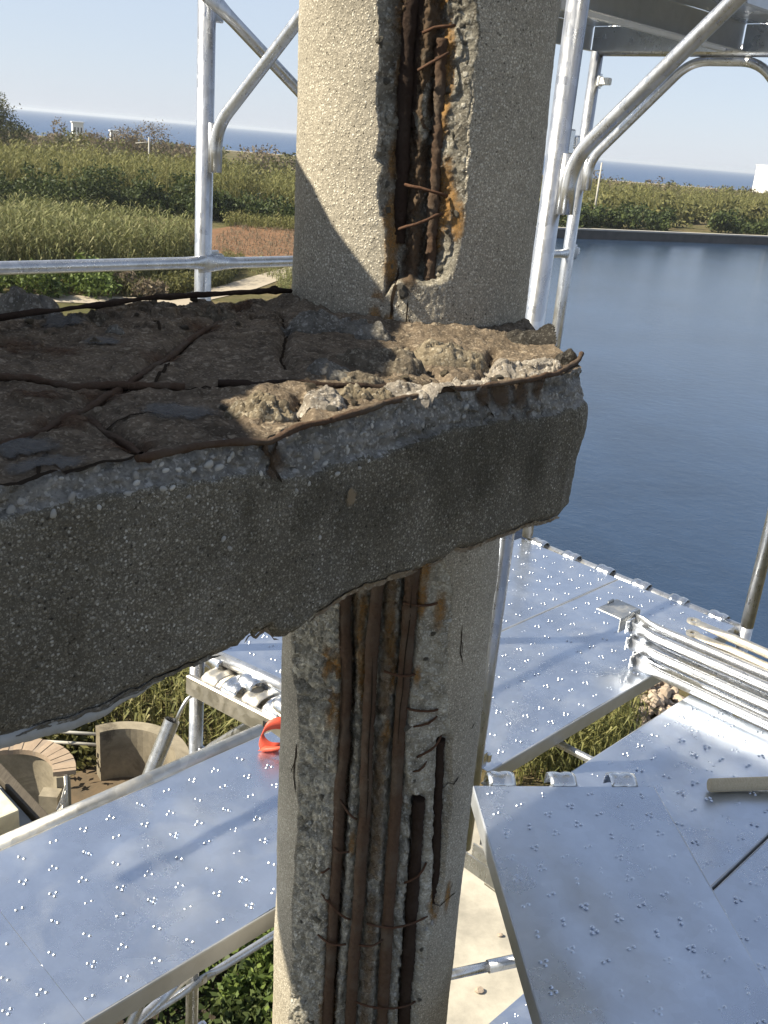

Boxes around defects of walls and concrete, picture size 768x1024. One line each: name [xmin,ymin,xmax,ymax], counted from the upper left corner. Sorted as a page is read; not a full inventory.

rust [383,0,464,287]
spalling [375,0,481,299]
crack [0,323,214,486]
crack [261,442,282,482]
spalling [0,367,587,519]
rust [476,378,545,419]
spalling [289,516,560,1024]
rust [320,896,342,1024]